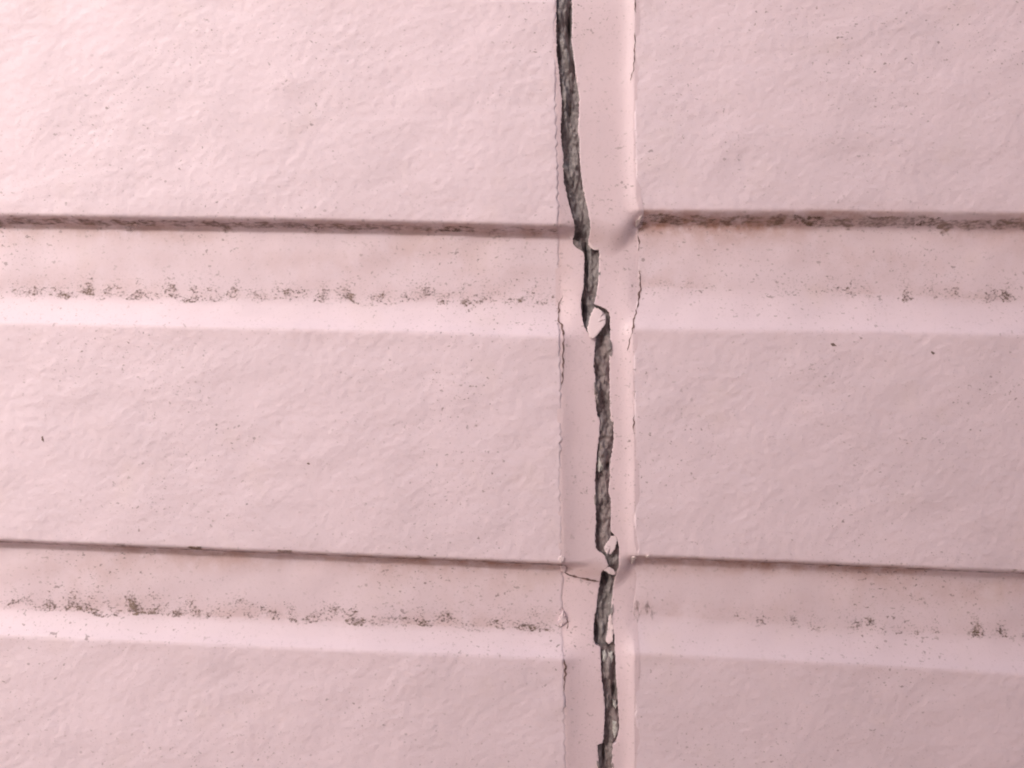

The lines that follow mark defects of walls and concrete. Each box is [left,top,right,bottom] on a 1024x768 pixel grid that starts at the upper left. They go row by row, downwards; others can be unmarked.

water stain [29,273,237,303]
crack [556,0,642,768]
water stain [8,591,210,617]
water stain [247,604,383,626]